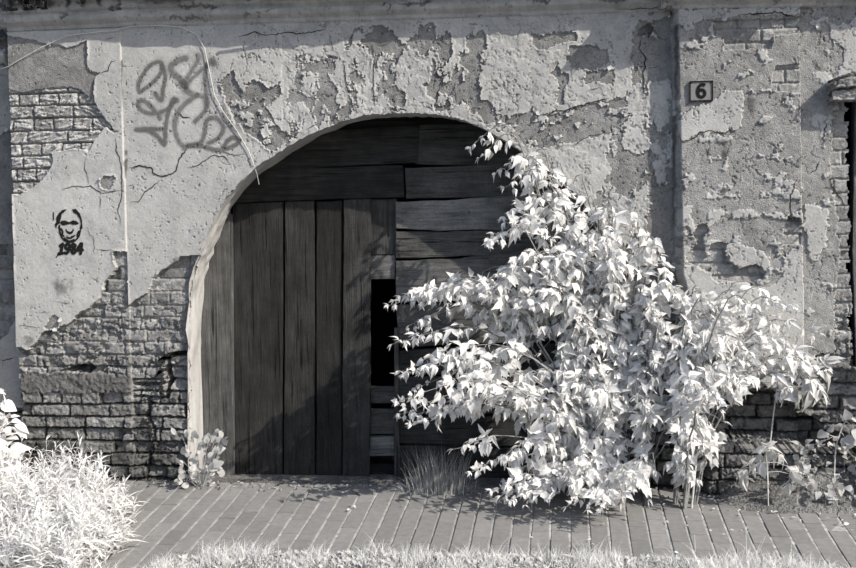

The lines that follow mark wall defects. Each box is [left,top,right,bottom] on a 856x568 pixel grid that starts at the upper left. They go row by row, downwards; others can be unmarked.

spalling [0,35,117,340]
crack [65,138,243,223]
peeling [218,5,856,500]
crack [540,88,621,115]
crack [638,31,669,99]
crack [789,60,856,219]
spalling [0,249,201,482]